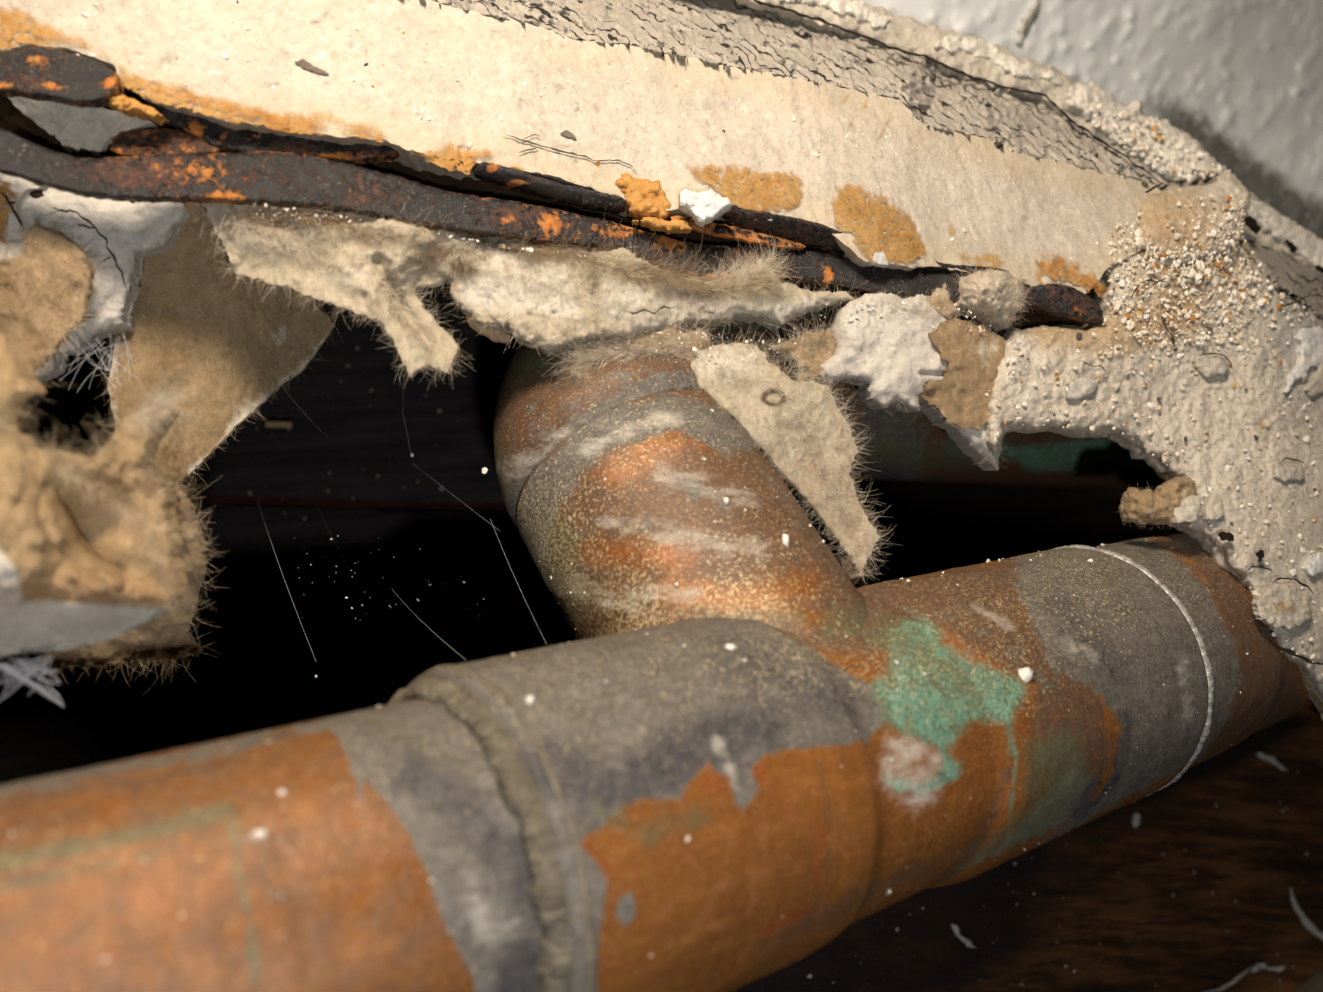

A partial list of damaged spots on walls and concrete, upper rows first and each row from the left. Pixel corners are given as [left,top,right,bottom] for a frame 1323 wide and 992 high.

corrosion [108,73,329,136]
corrosion [423,144,491,175]
corrosion [615,173,692,235]
peeling [670,189,806,250]
corrosion [690,164,803,211]
corrosion [831,184,926,264]
flaking render [868,252,888,268]
peeling [915,261,1009,274]
peeling [465,314,511,344]
flaking render [1172,492,1234,541]
crack [1245,548,1323,597]
crack [1264,640,1323,665]